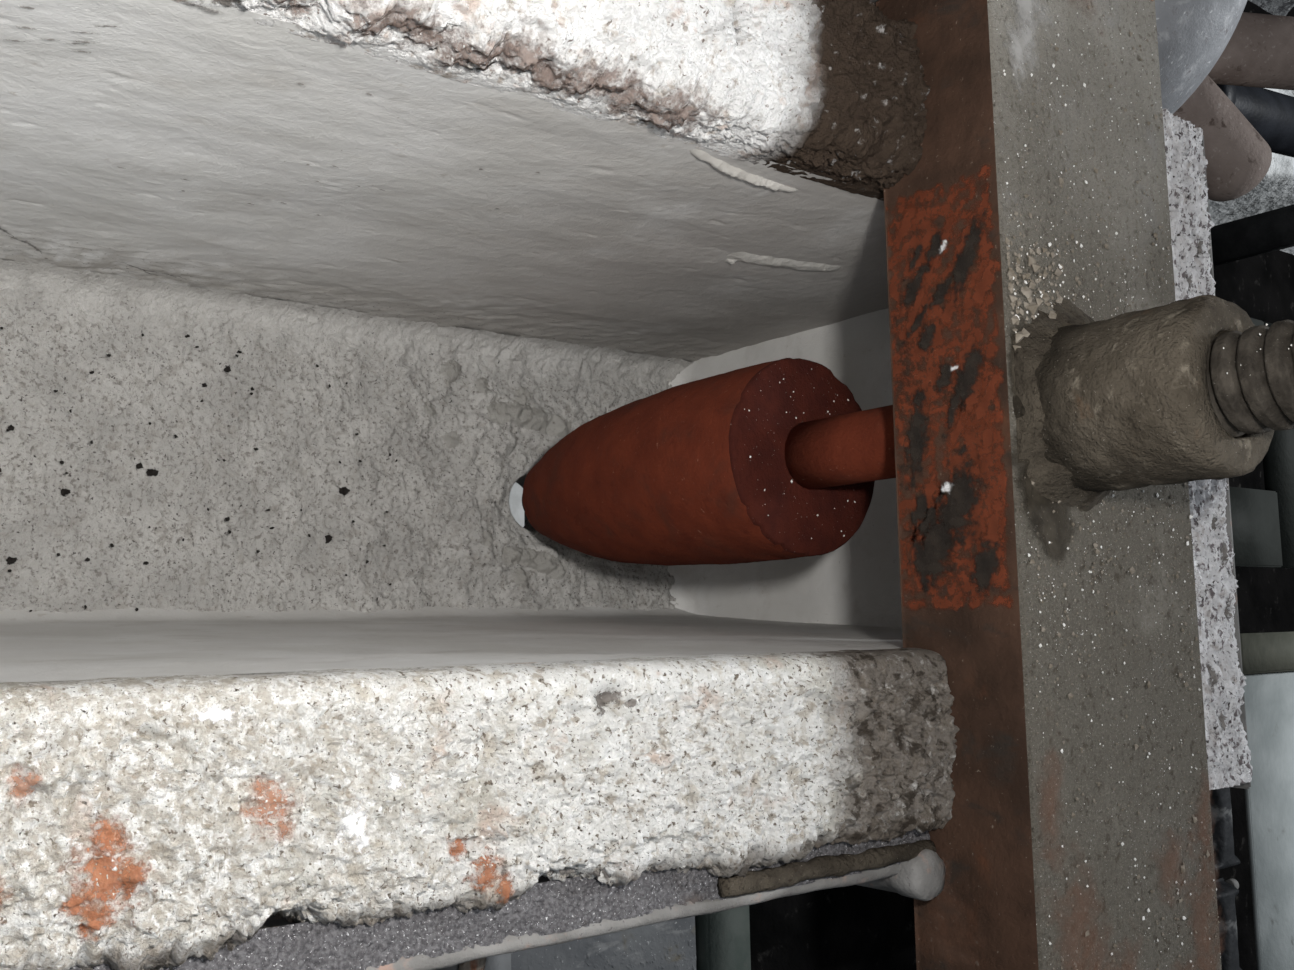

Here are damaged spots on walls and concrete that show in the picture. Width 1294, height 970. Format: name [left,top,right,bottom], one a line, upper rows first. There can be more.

rust [241,776,295,841]
rust [61,819,152,940]
rust [449,839,514,904]